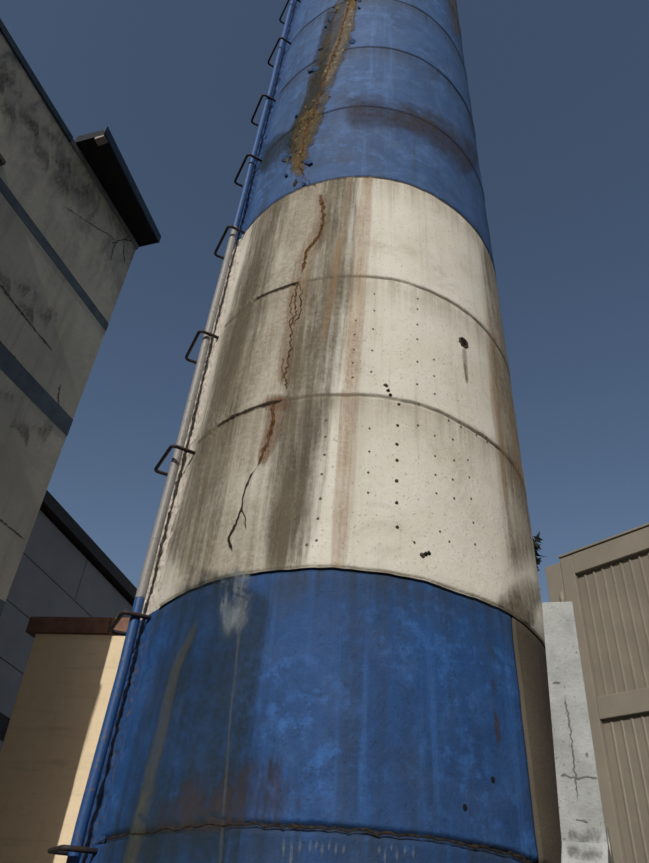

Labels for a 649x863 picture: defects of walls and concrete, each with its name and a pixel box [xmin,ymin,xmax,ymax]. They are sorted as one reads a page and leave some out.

peeling [281,0,361,187]
crack [67,208,132,261]
crack [0,285,51,349]
crack [218,195,326,550]
leakage [500,587,536,624]
crack [553,681,597,793]